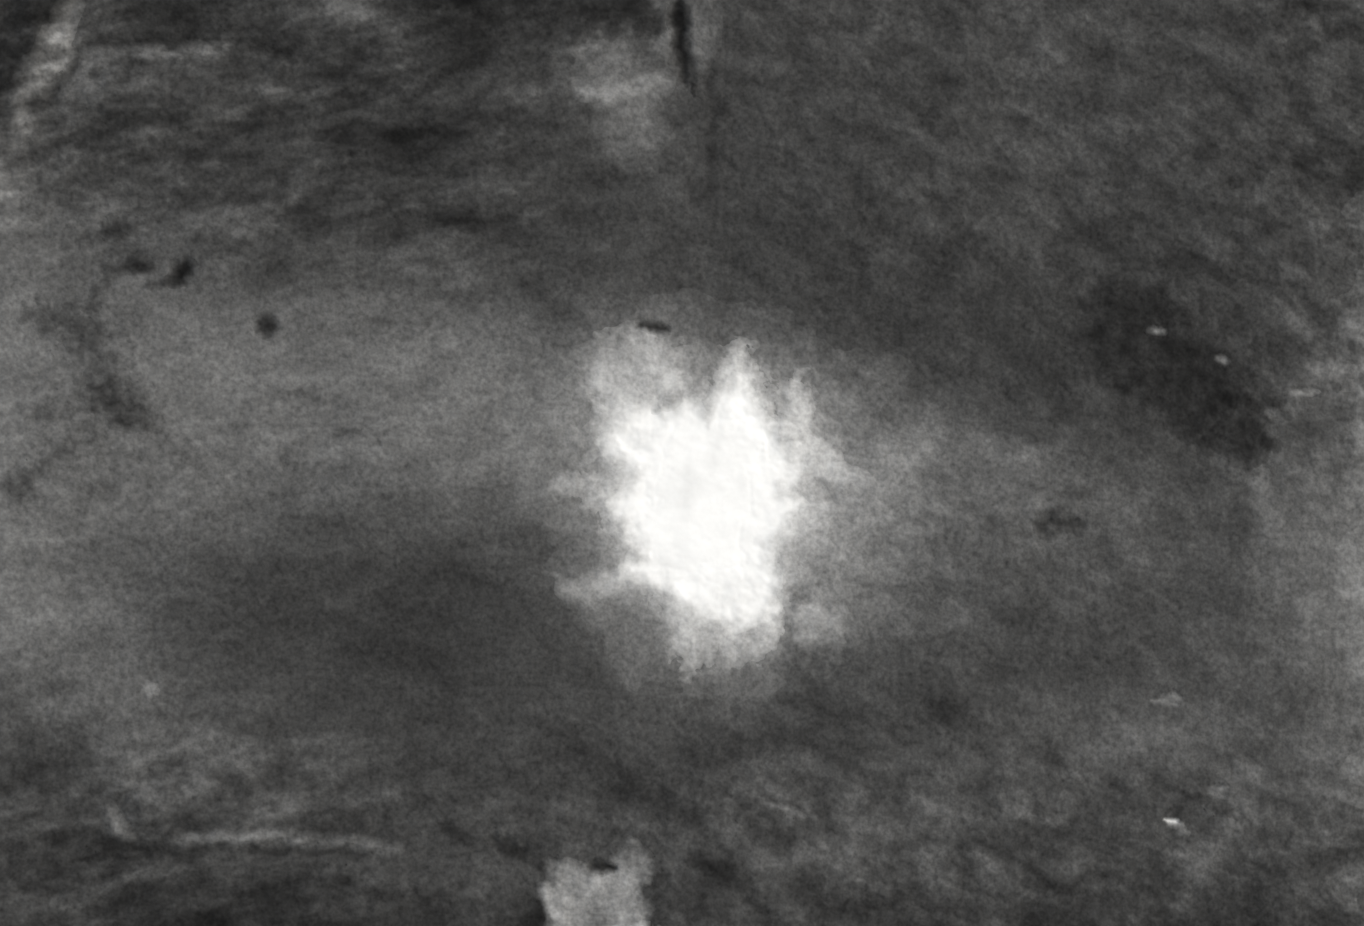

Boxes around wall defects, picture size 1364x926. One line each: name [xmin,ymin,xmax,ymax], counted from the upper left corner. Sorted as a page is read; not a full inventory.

crack [669,0,721,201]
flaking render [513,288,950,711]
spalling [584,857,619,879]